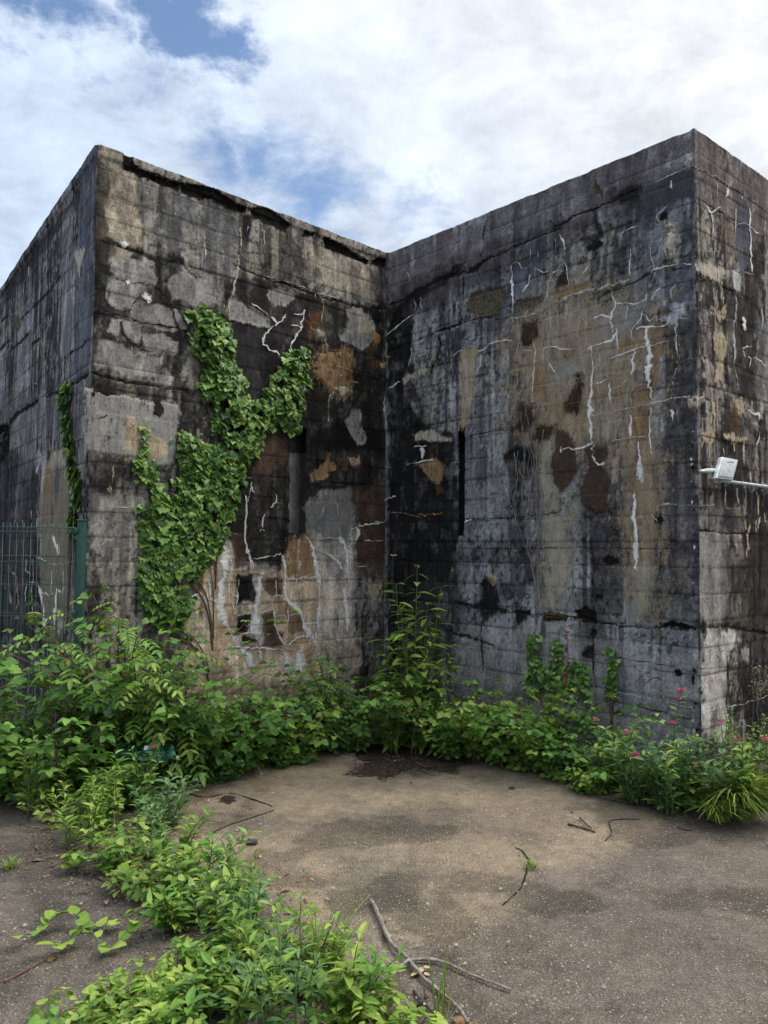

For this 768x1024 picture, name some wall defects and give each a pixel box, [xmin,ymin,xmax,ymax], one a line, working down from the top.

crack [234,166,767,419]
spalling [465,271,591,318]
peeling [83,382,181,469]
spalling [407,429,452,496]
water stain [447,165,767,639]
water stain [198,484,358,678]